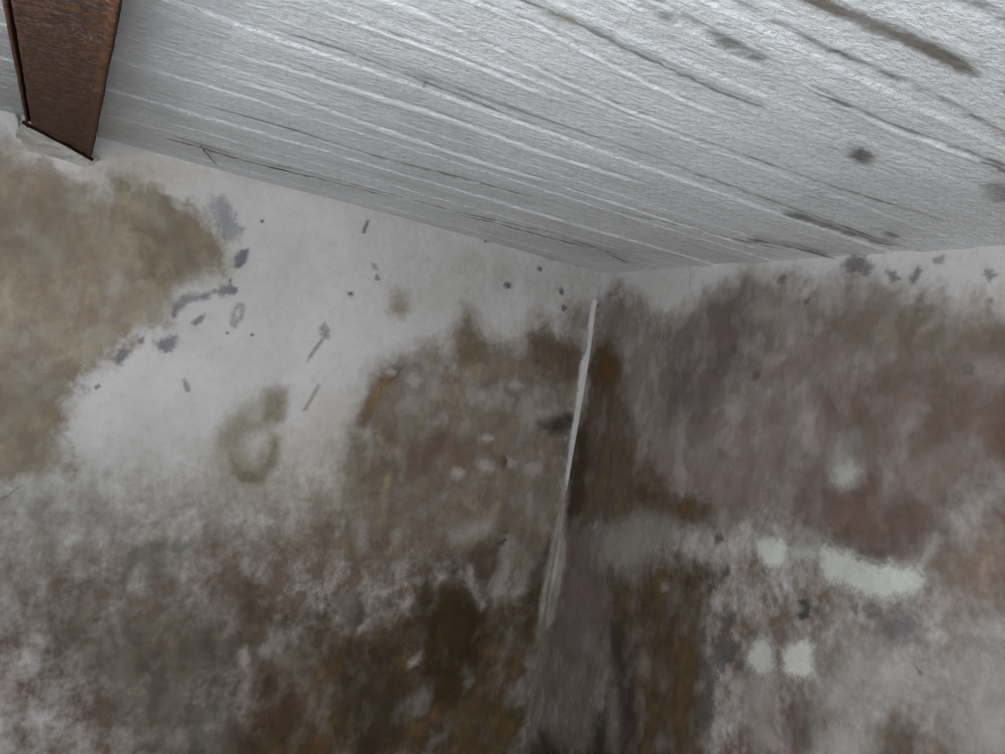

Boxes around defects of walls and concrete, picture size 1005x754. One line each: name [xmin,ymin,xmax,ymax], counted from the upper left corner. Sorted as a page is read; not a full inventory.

damp [0,147,224,479]
damp [47,585,265,751]
damp [216,255,1005,754]